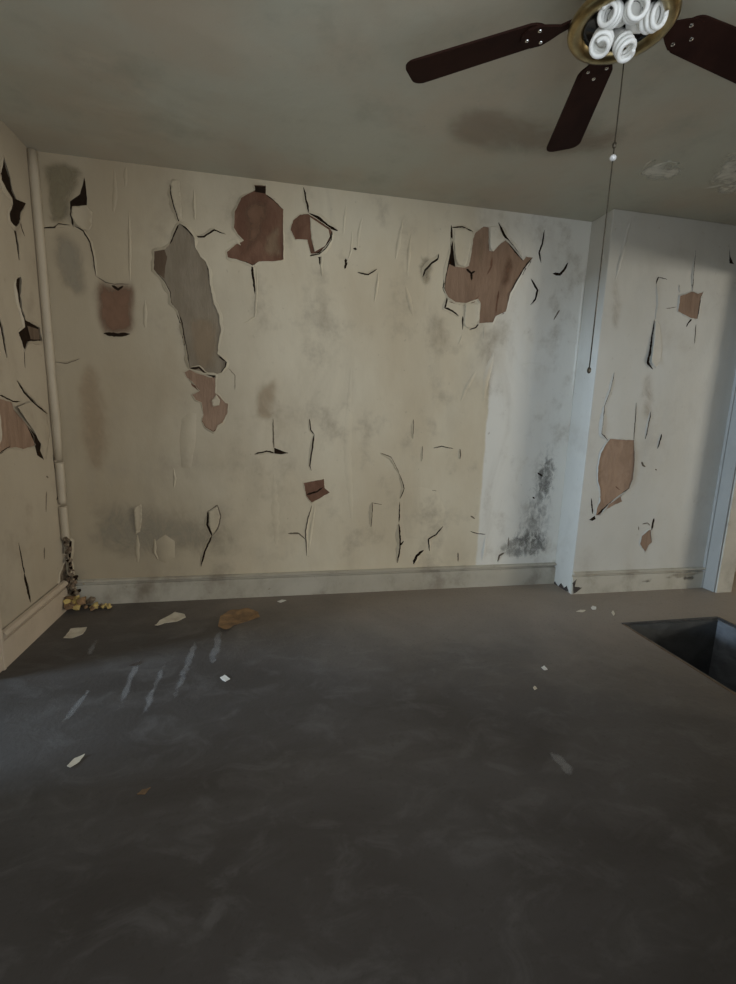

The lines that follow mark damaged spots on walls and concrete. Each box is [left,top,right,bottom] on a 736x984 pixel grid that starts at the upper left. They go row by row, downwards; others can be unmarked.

peeling [0,156,26,258]
peeling [14,276,42,363]
peeling [70,178,132,337]
peeling [151,179,338,434]
peeling [442,222,533,345]
peeling [647,250,704,369]
peeling [0,380,55,468]
peeling [302,478,331,504]
crack [369,453,424,565]
crack [411,419,461,461]
peeling [589,373,637,521]
spalling [58,536,85,596]